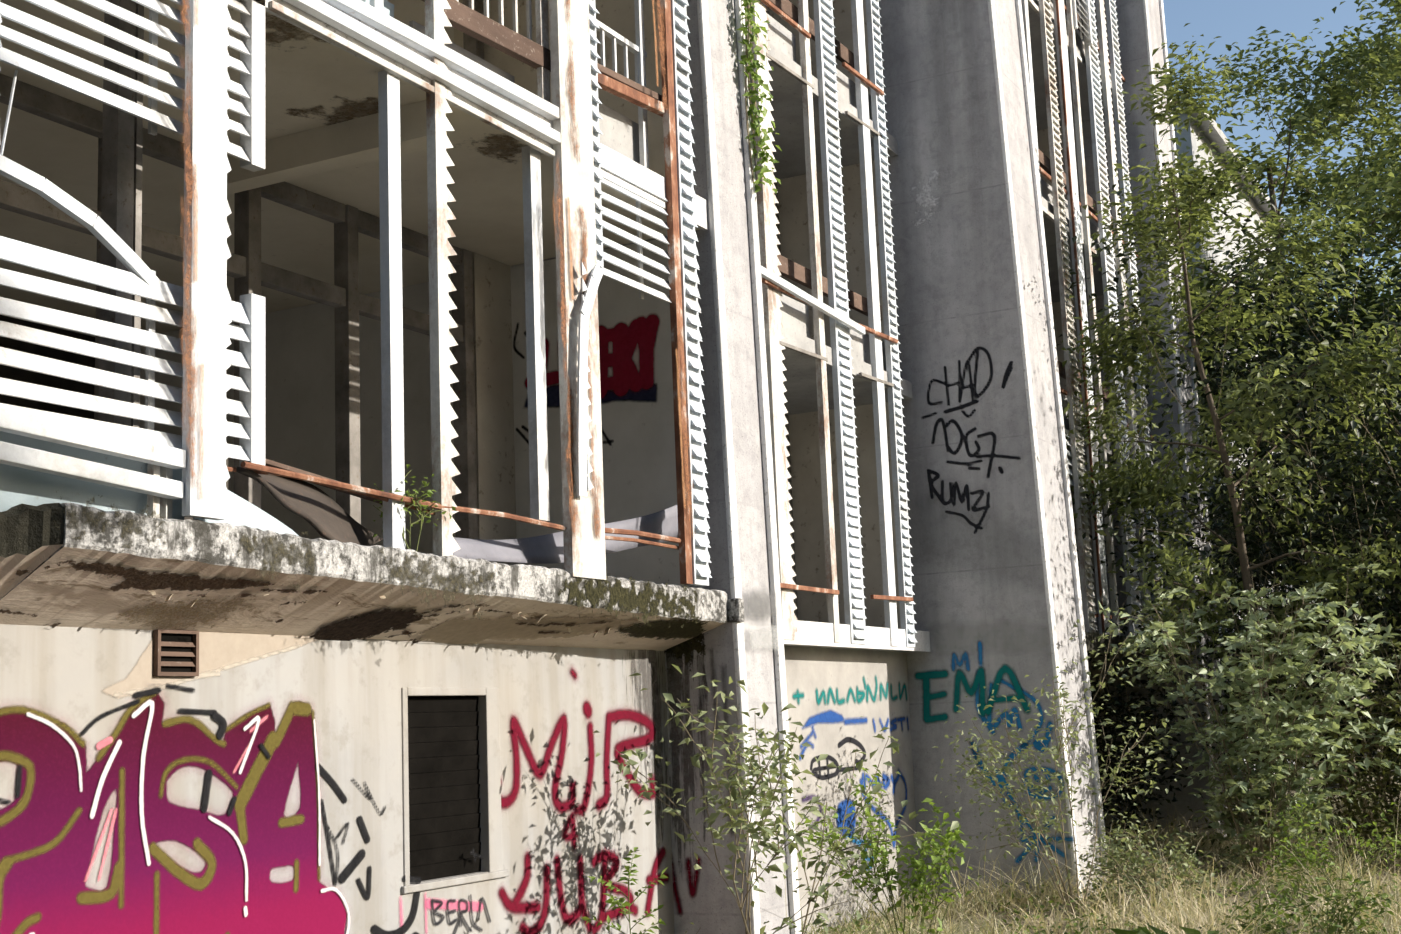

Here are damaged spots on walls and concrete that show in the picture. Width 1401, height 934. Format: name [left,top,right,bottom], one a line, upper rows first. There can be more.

corrosion [181,0,198,35]
corrosion [567,39,580,161]
corrosion [652,0,667,109]
corrosion [181,83,204,495]
corrosion [553,163,600,538]
corrosion [676,321,694,537]
water stain [626,635,727,878]